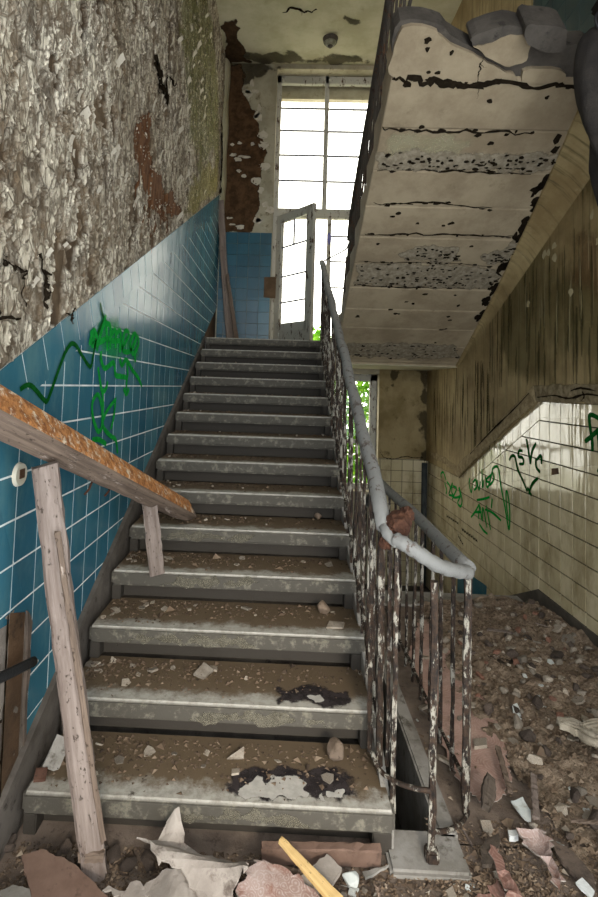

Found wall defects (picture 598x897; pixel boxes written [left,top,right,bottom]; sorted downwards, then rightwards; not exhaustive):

crack [283,6,317,14]
spalling [466,10,523,46]
crack [392,57,574,96]
crack [382,127,535,136]
peeling [0,0,274,369]
damp [419,232,598,462]
peeling [0,384,194,514]
peeling [182,775,345,828]